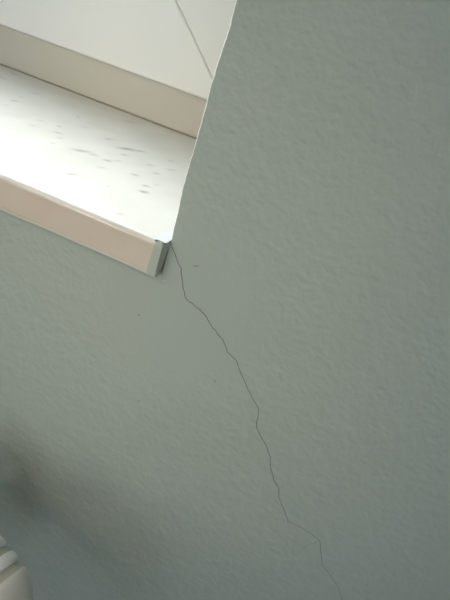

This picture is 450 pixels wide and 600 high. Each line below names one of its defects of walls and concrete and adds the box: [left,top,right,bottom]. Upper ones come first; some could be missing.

crack [169,241,342,598]